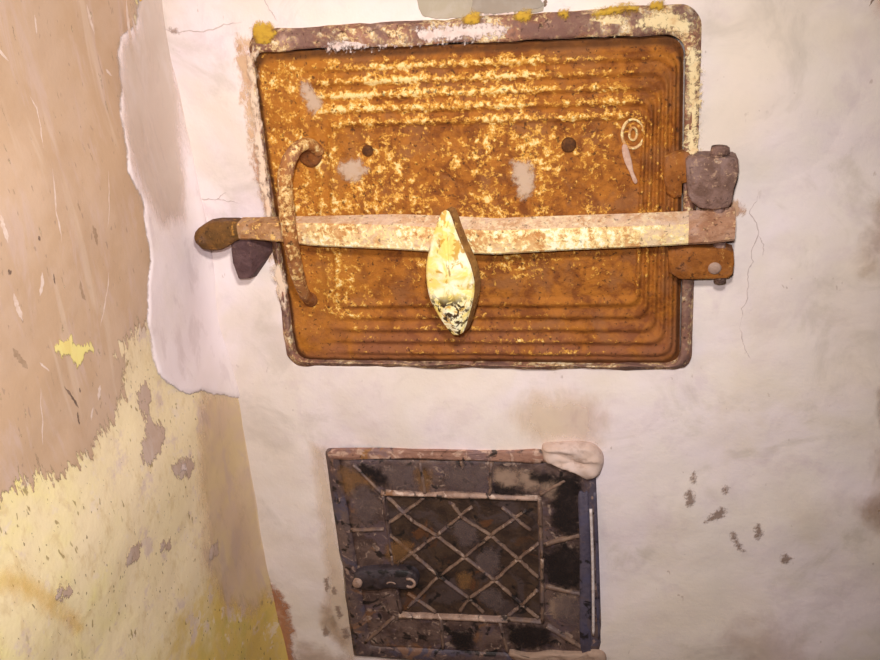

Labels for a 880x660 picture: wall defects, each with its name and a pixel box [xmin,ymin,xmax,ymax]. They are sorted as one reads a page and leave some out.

rust [236,39,266,202]
crack [740,196,764,360]
spalling [271,586,294,660]